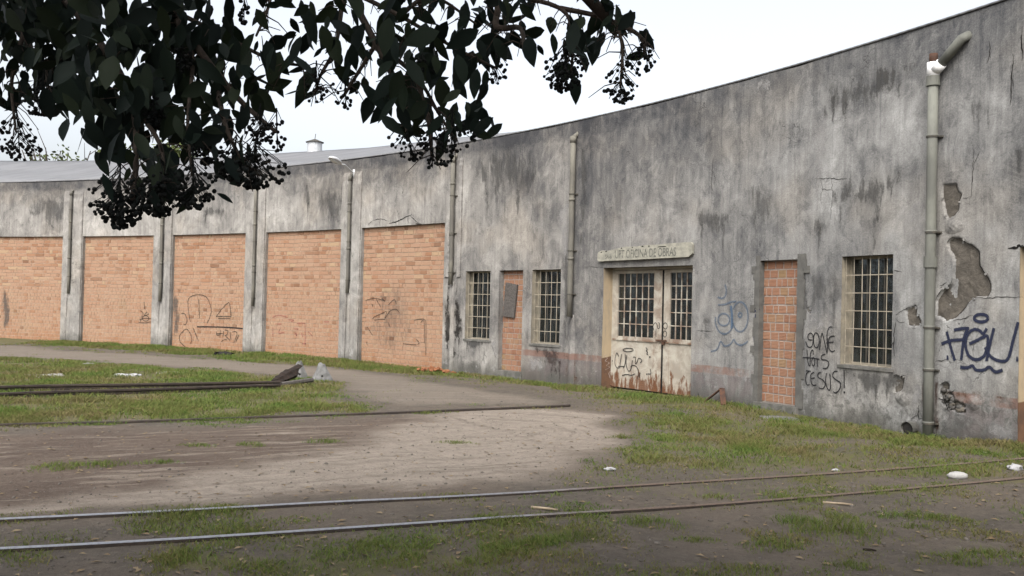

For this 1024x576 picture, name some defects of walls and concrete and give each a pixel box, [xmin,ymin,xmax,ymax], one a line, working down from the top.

damp [824,68,895,114]
damp [834,172,901,220]
flaking render [941,183,962,218]
flaking render [936,237,991,321]
flaking render [906,305,922,328]
flaking render [940,382,966,415]